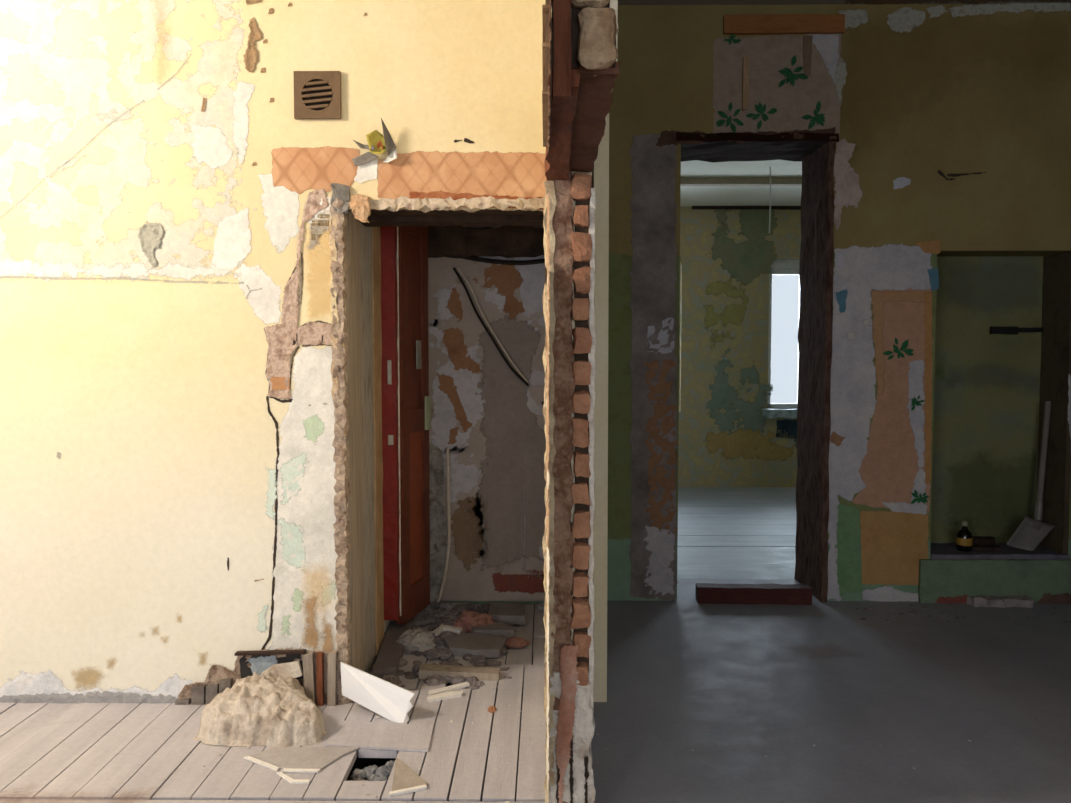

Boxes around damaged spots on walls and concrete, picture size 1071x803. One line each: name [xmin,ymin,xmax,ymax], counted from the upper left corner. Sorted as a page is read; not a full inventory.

crack [0,276,262,299]
peeling [0,0,579,803]
crack [261,253,332,650]
flaking render [628,127,863,601]
peeling [827,240,941,602]
peeling [893,177,911,189]
flaking render [887,3,1071,33]